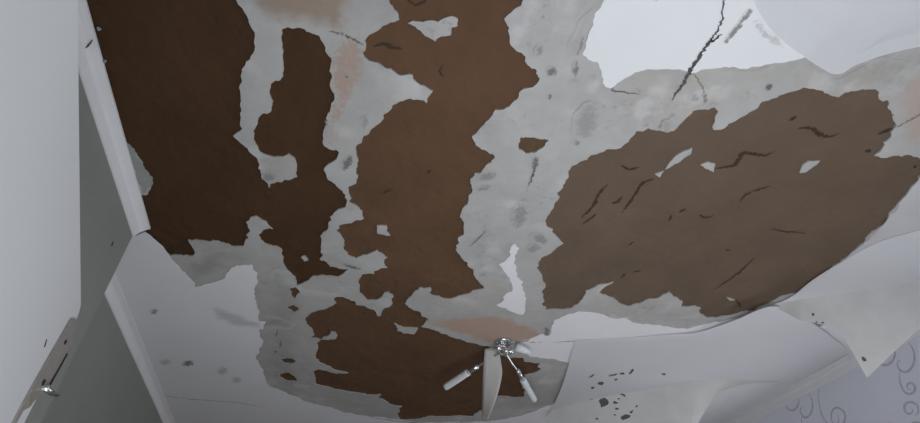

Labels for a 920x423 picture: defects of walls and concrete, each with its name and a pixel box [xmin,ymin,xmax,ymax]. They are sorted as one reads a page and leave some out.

peeling [582,0,805,88]
crack [672,0,725,100]
spalling [87,0,539,419]
spalling [497,88,920,397]
water stain [425,314,551,348]